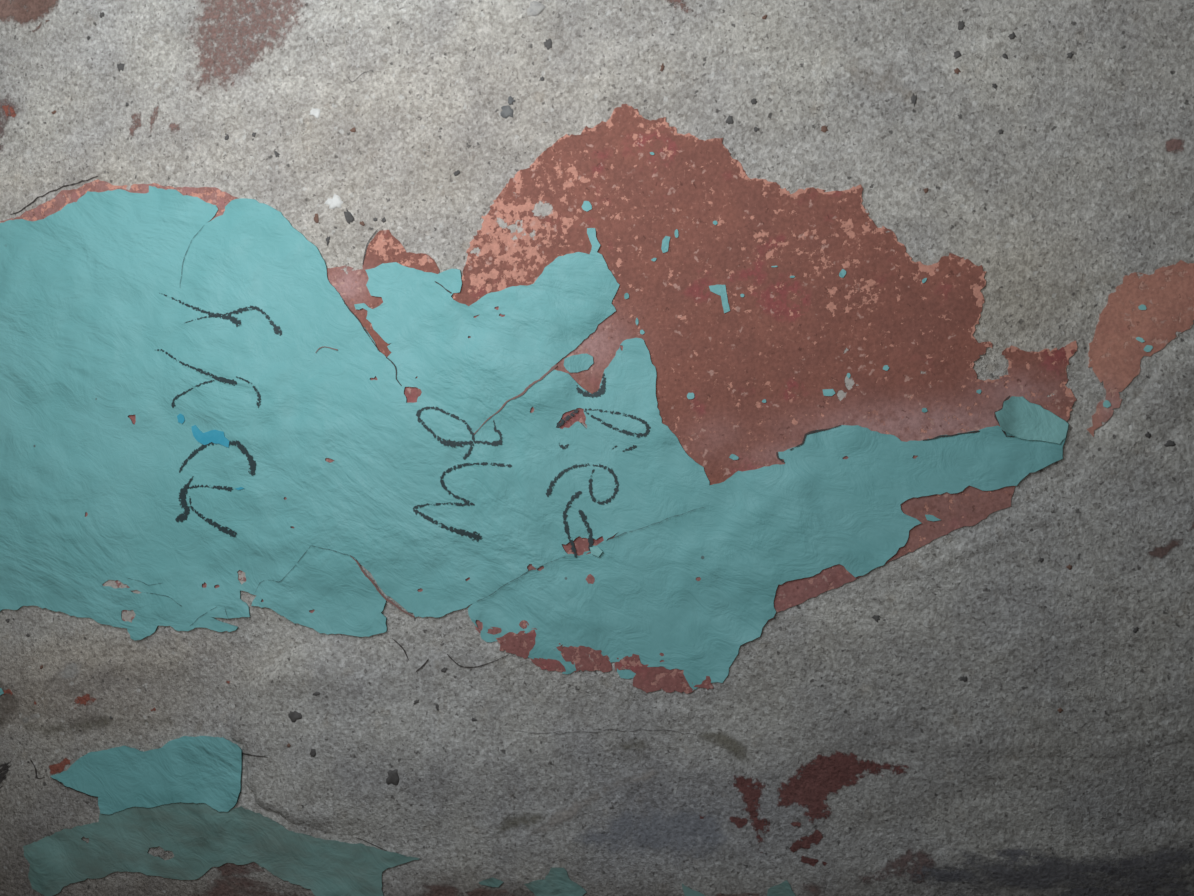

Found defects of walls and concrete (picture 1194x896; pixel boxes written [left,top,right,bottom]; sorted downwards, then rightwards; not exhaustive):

crack [10,176,98,215]
peeling [0,104,1194,694]
crack [610,507,703,539]
damp [1149,540,1180,558]
crack [477,557,564,601]